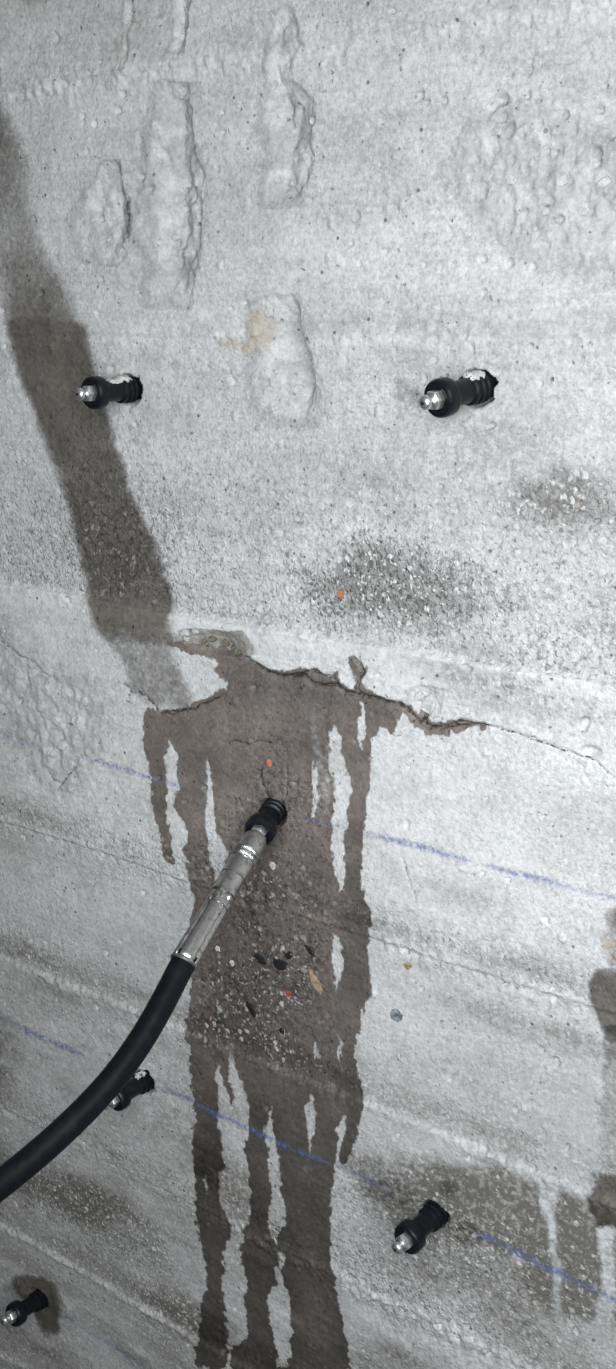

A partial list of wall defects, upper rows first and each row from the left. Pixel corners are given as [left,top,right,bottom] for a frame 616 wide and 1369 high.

damp [7,251,486,1369]
crack [257,658,616,778]
damp [590,971,616,1042]
damp [537,1064,616,1330]